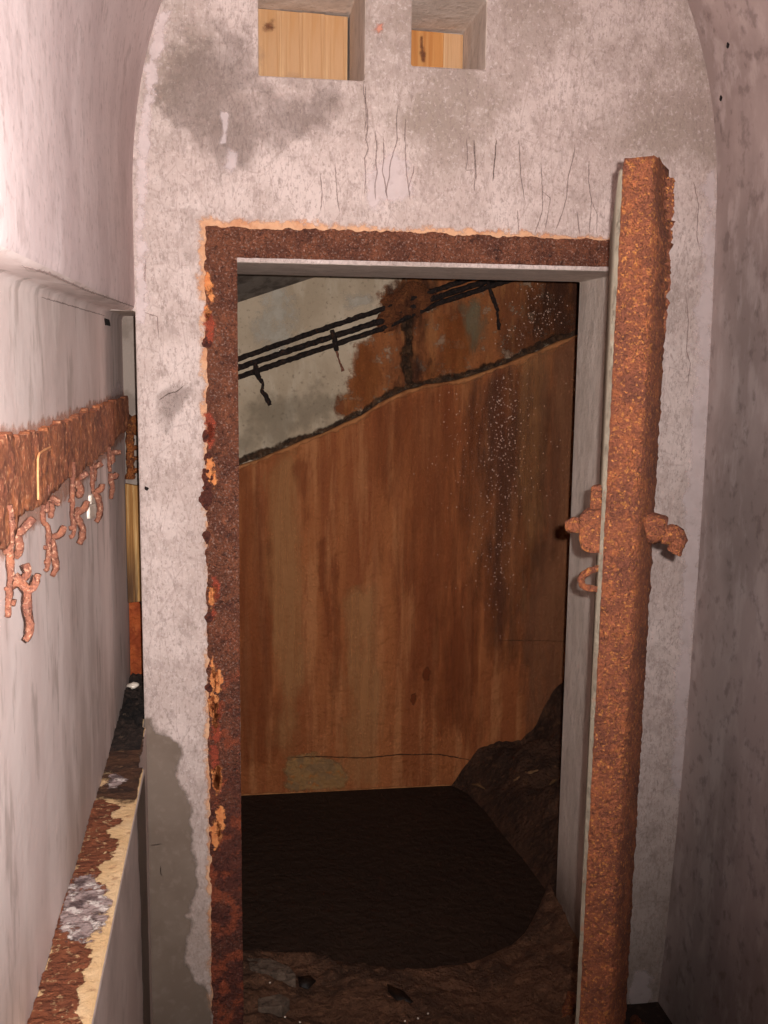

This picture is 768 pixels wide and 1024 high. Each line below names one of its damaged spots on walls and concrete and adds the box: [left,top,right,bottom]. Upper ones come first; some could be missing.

corrosion [663,177,675,333]
corrosion [197,217,610,485]
corrosion [207,577,220,619]
corrosion [239,278,580,795]
peeling [107,774,127,788]
corrosion [204,655,226,944]
peeling [59,874,113,943]
corrosion [561,991,577,1018]